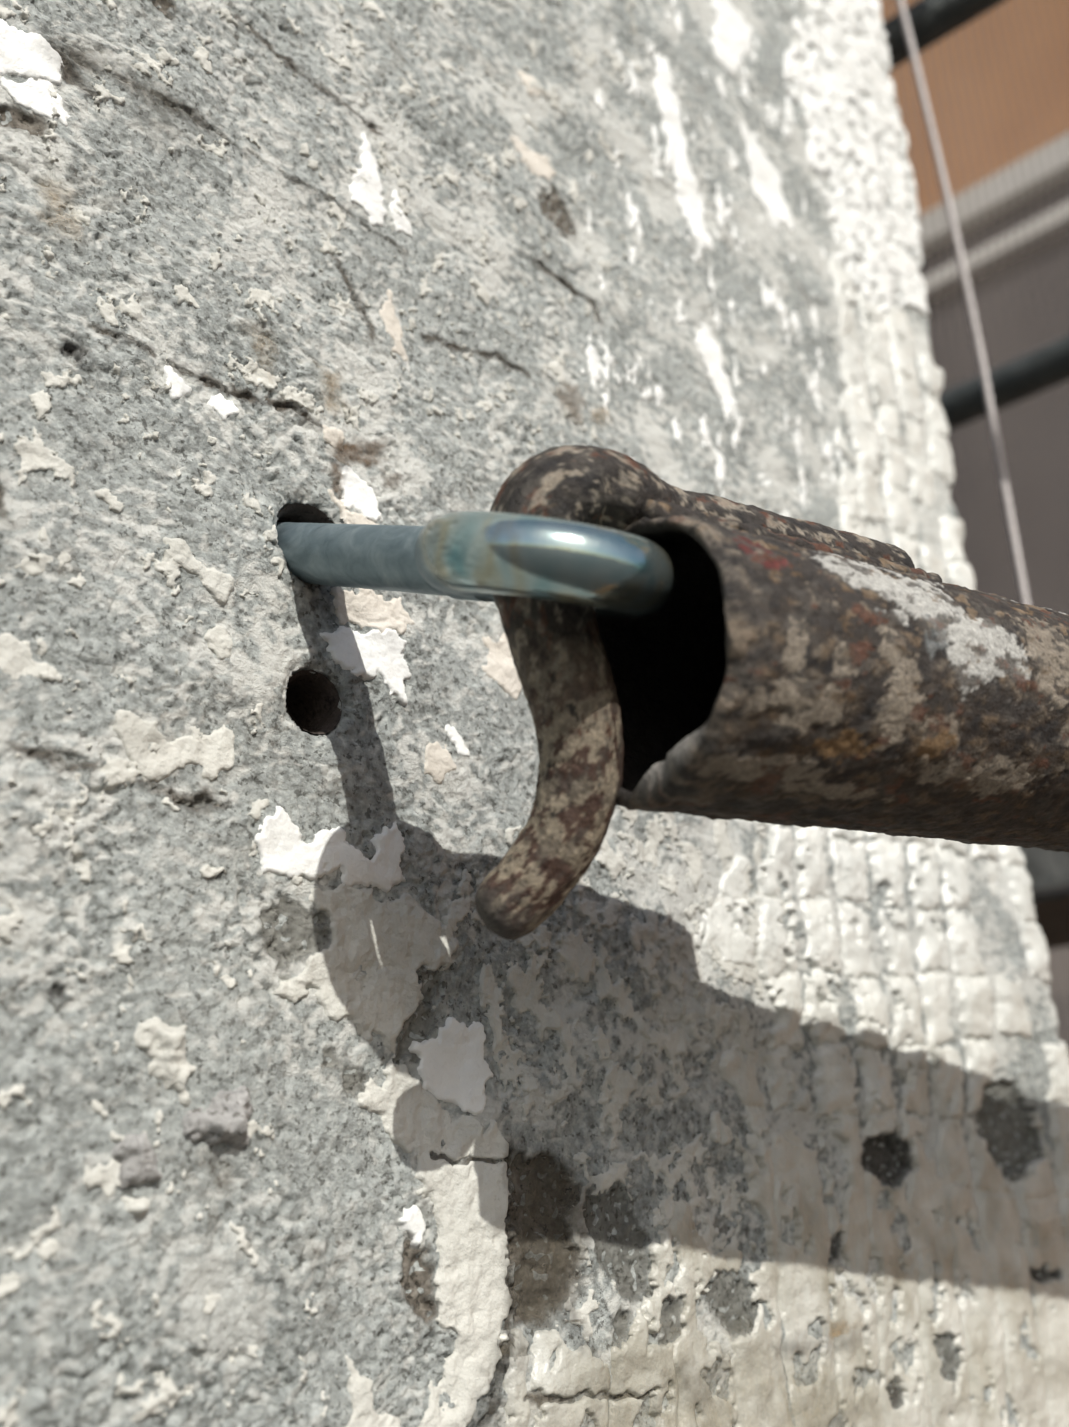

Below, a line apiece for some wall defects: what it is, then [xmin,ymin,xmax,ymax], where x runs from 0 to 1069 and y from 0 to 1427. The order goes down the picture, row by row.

peeling [0,0,72,163]
crack [54,49,99,96]
crack [233,14,381,135]
crack [337,259,374,339]
crack [422,335,531,377]
peeling [224,0,842,525]
crack [540,262,601,322]
peeling [0,343,125,523]
peeling [319,586,415,706]
peeling [239,799,787,1427]
peeling [83,1157,129,1198]
peeling [115,1347,195,1423]